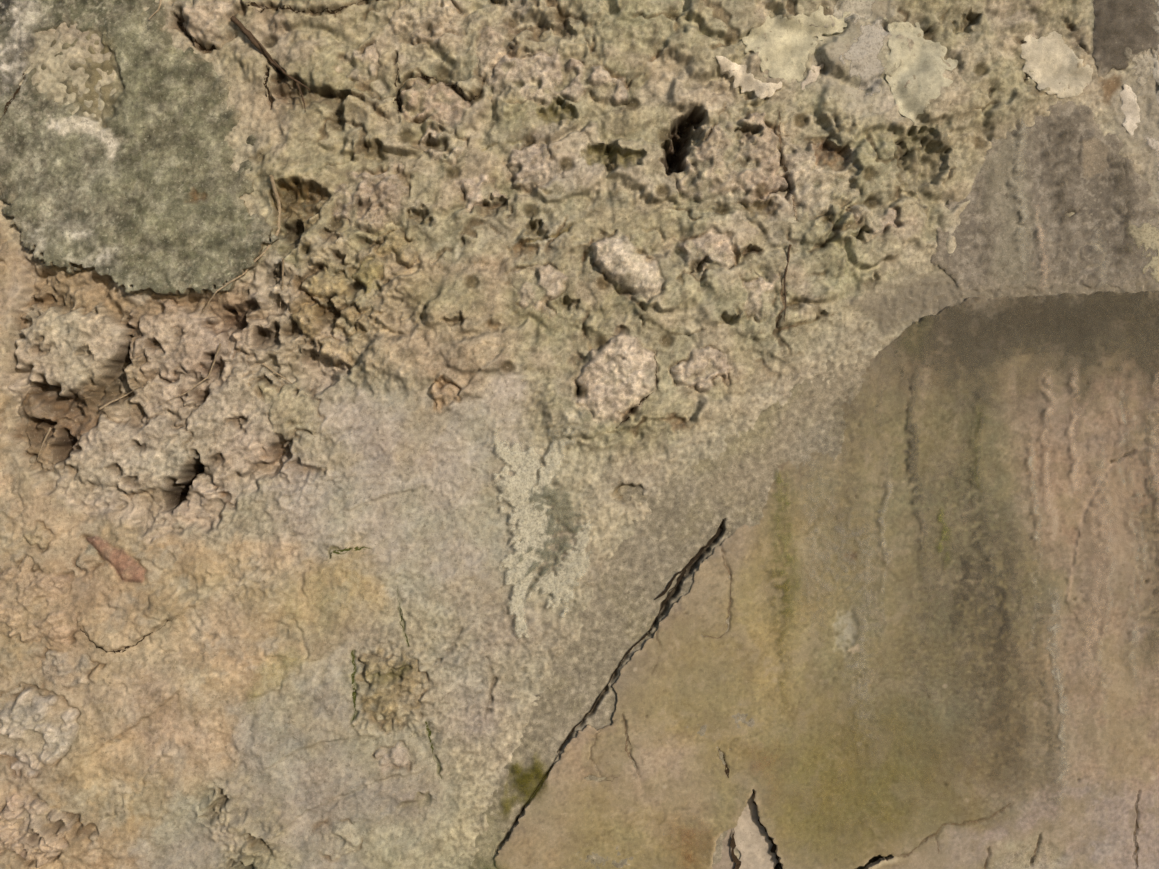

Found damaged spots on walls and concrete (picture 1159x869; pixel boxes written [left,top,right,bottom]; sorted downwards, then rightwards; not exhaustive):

crack [0,73,25,120]
spalling [421,133,452,162]
spalling [473,193,510,220]
spalling [648,5,870,263]
peeling [0,0,435,535]
spalling [523,213,677,433]
spalling [716,311,741,328]
water stain [908,407,1067,781]
crack [511,519,732,829]
peeling [495,749,782,869]
crack [903,803,1012,858]
spalling [983,841,1066,869]